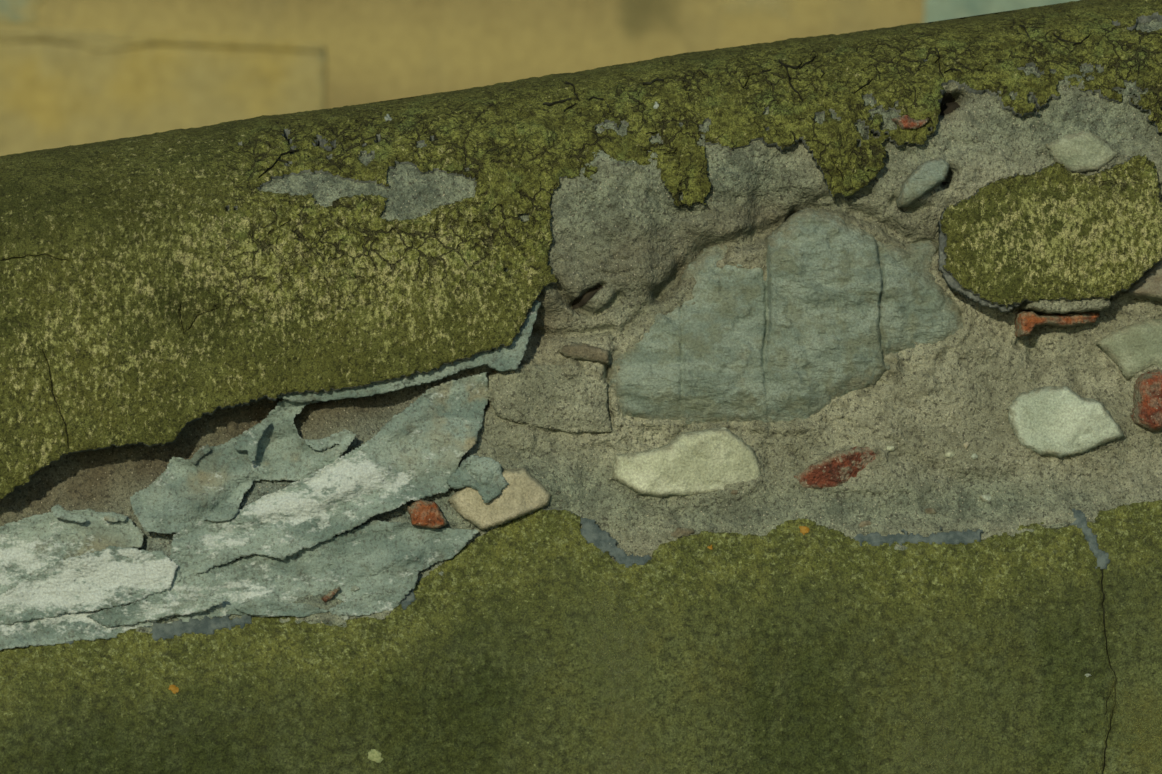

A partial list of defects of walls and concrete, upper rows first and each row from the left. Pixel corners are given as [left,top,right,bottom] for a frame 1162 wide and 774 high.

peeling [924,0,1079,23]
spalling [0,78,1162,651]
crack [1101,569,1117,774]